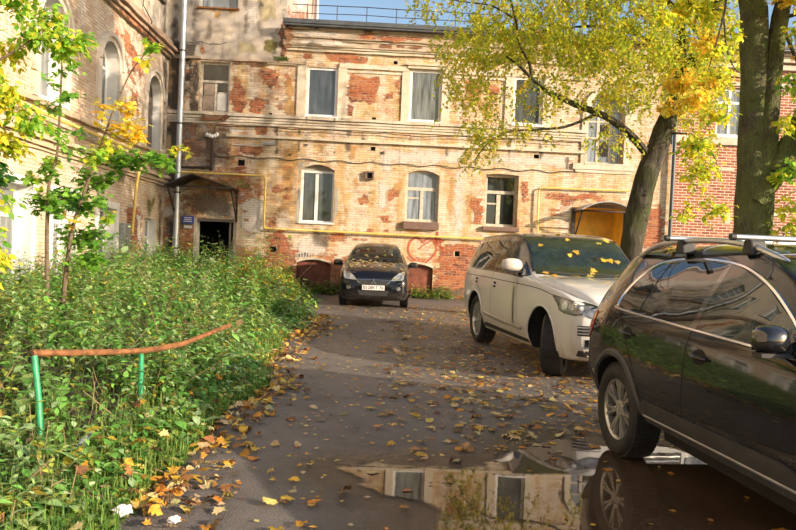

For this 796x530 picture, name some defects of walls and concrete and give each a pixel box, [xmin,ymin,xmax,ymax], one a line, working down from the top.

leakage [244,1,263,33]
flaking render [257,0,368,63]
spalling [116,7,156,117]
peeling [233,42,291,88]
peeling [183,77,265,156]
peeling [347,74,402,116]
flaking render [241,188,300,274]
peeling [272,185,292,200]
peeling [469,198,484,224]
peeling [546,188,605,216]
peeling [643,204,667,250]
spalling [433,241,481,299]